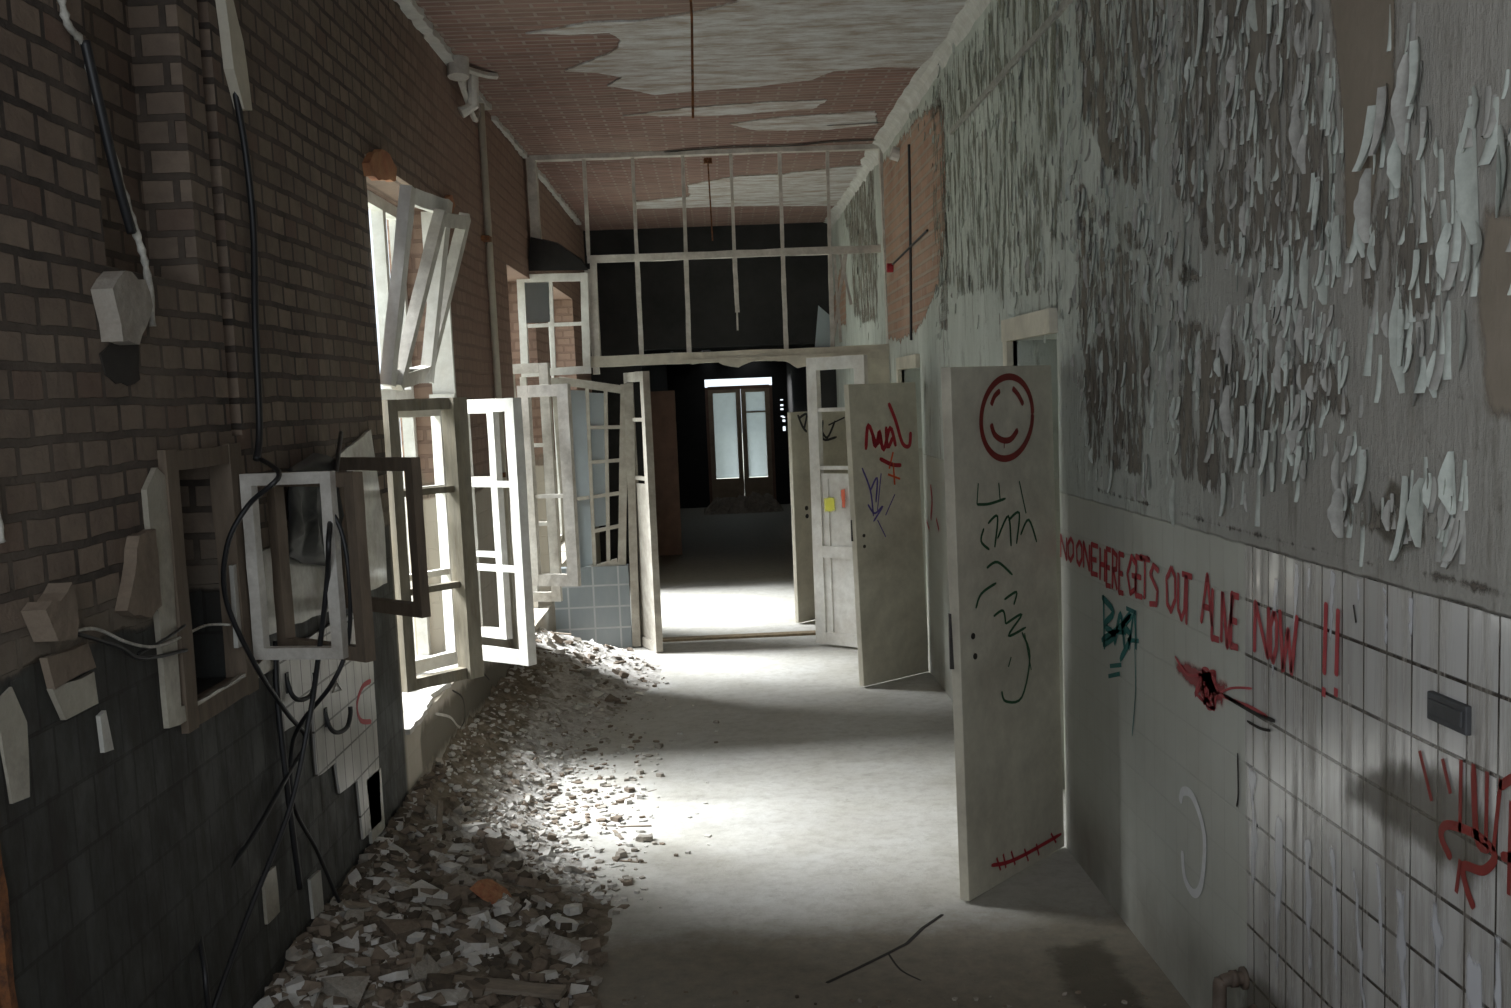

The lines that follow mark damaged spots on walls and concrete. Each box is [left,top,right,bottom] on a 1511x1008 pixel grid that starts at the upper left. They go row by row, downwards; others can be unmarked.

spalling [362,149,397,182]
peeling [525,0,1511,593]